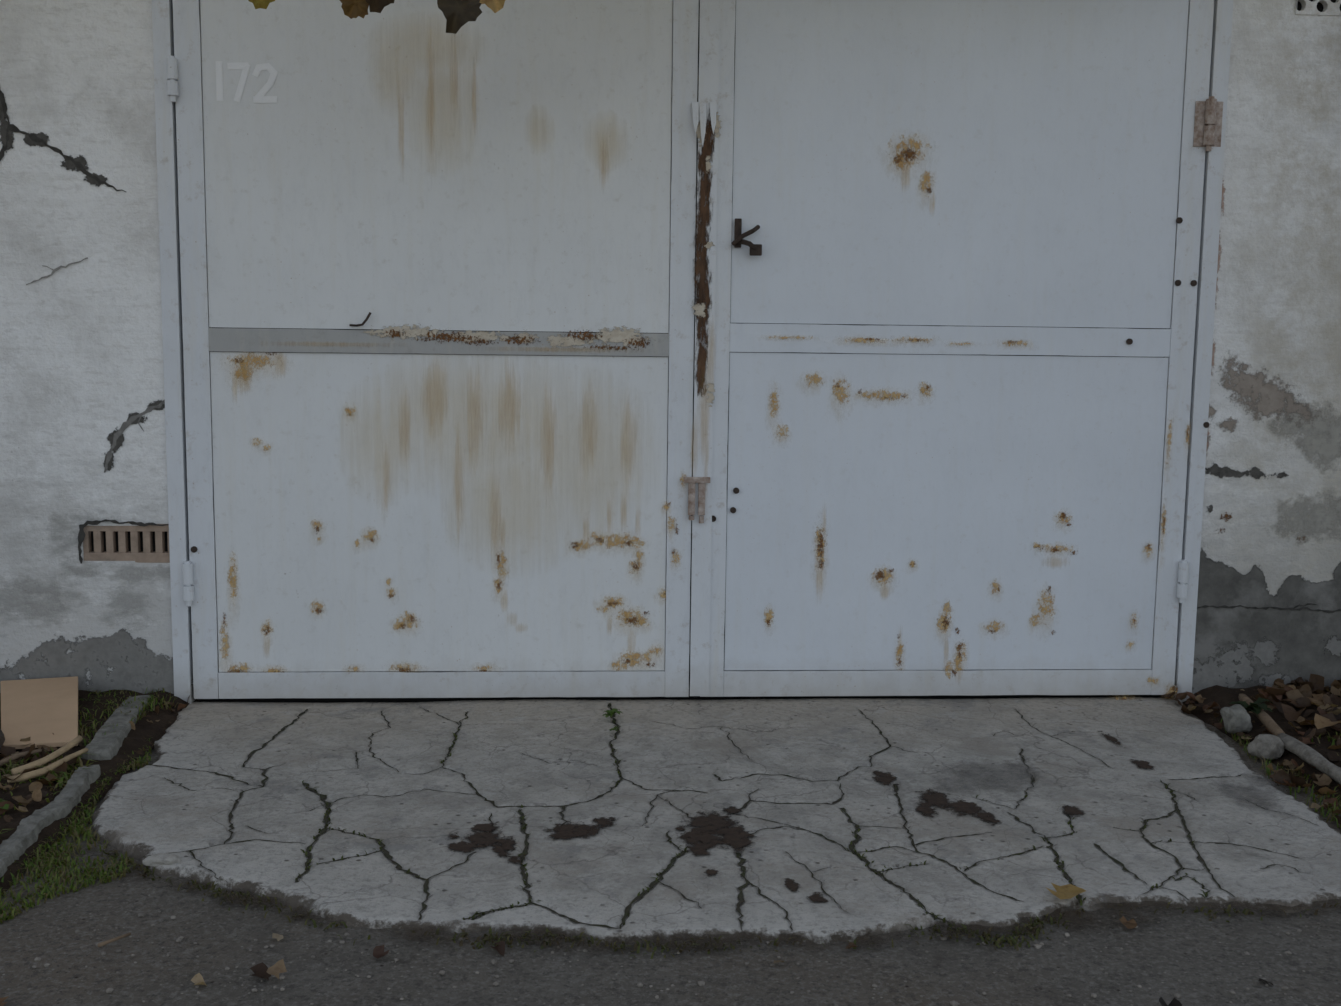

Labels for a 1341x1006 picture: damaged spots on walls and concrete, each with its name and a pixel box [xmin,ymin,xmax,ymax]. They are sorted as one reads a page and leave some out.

crack [0,90,126,192]
rust [894,134,931,193]
rust [691,109,721,407]
crack [104,399,165,473]
flaking render [1205,463,1289,479]
peeling [1207,357,1341,471]
rust [568,532,644,574]
rust [816,531,825,568]
flaking render [0,629,174,694]
rust [937,603,965,678]
flaking render [1192,548,1341,694]
crack [143,704,1319,930]